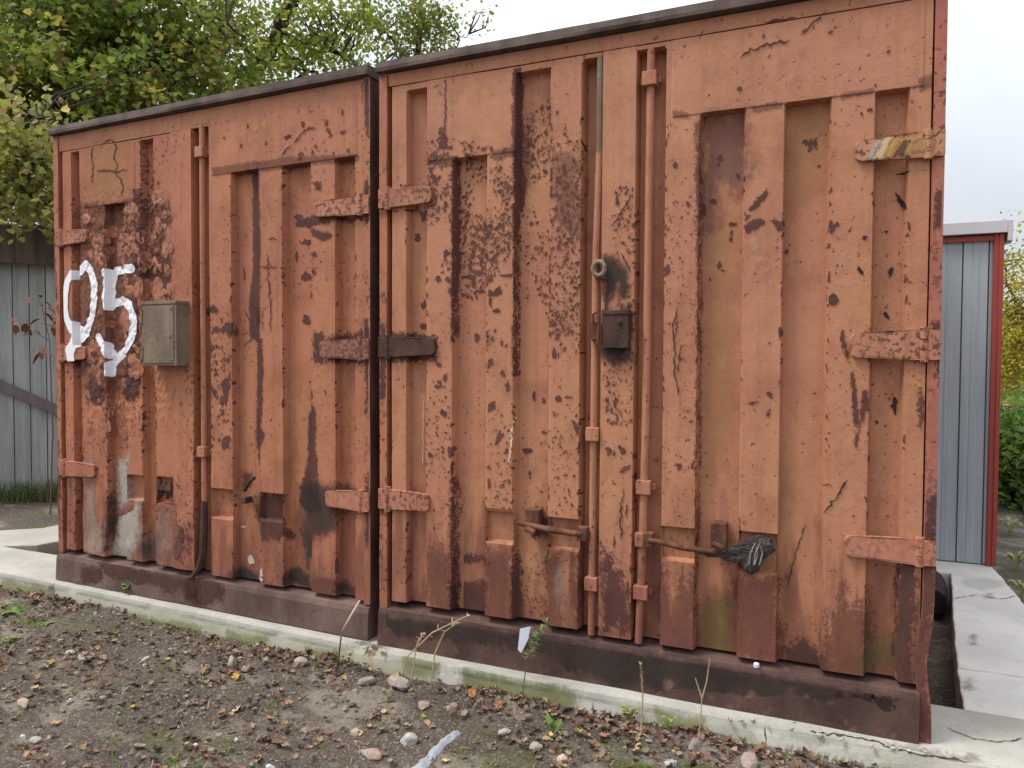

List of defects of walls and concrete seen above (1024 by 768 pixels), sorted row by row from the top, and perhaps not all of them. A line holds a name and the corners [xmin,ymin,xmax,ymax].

crack [741,11,825,58]
peeling [84,316,157,478]
peeling [71,161,172,310]
rust [207,170,319,542]
rust [294,67,527,414]
rust [694,120,725,476]
rust [850,371,869,447]
water stain [112,455,141,557]
rust [598,542,636,640]
crack [794,722,1021,763]